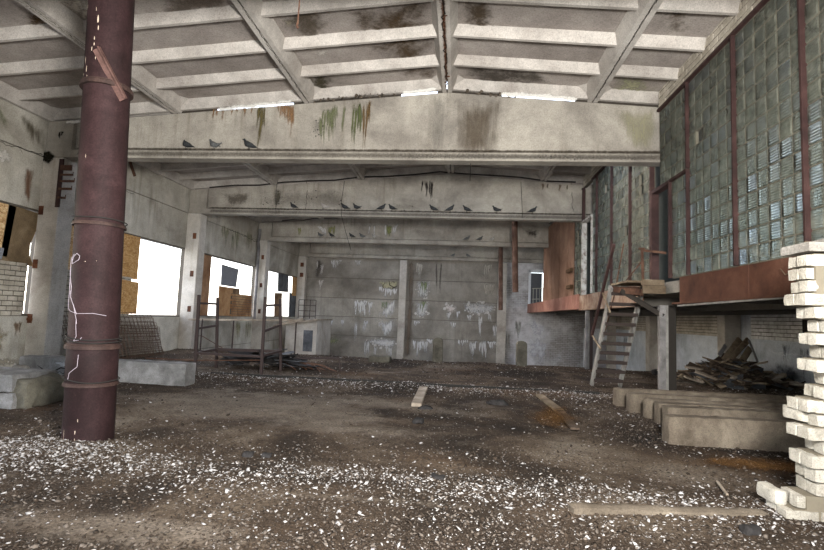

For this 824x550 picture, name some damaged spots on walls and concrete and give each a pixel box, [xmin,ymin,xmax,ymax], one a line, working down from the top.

leakage [358,3,421,30]
leakage [467,3,488,26]
leakage [381,38,429,58]
crack [440,0,448,88]
leakage [128,100,660,160]
leakage [354,300,373,334]
leakage [379,287,397,335]
leakage [405,263,442,356]
leakage [447,304,497,357]
leakage [773,366,799,380]